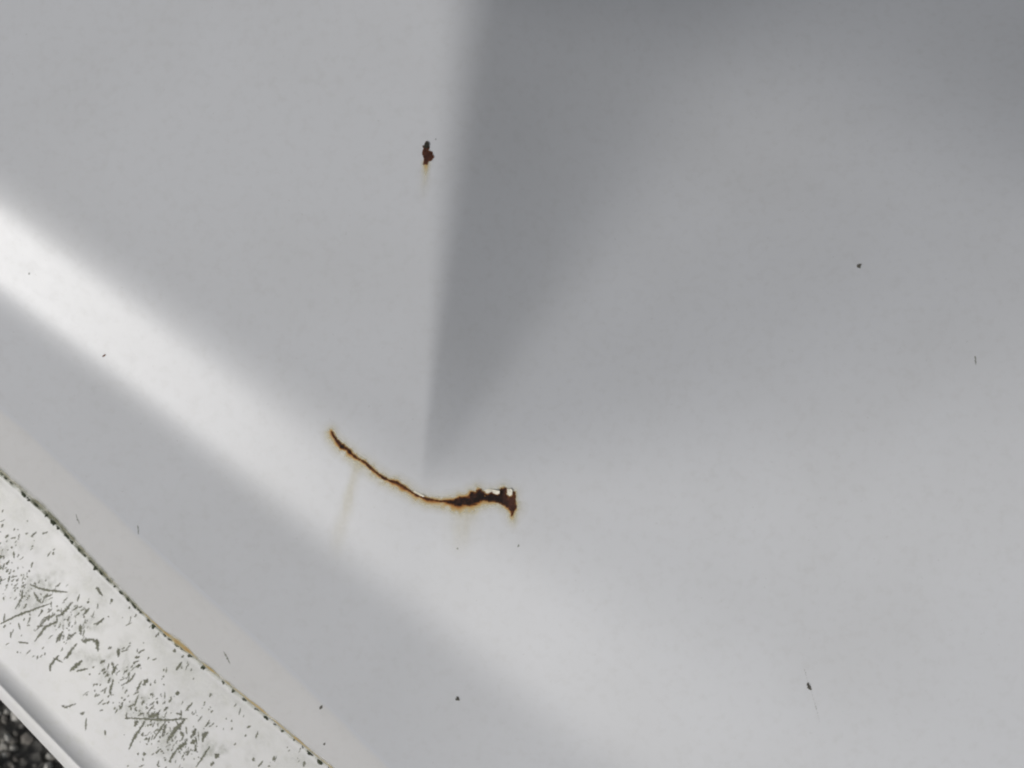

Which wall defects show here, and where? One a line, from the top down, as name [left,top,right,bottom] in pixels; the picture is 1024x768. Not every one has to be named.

rust [422,141,434,171]